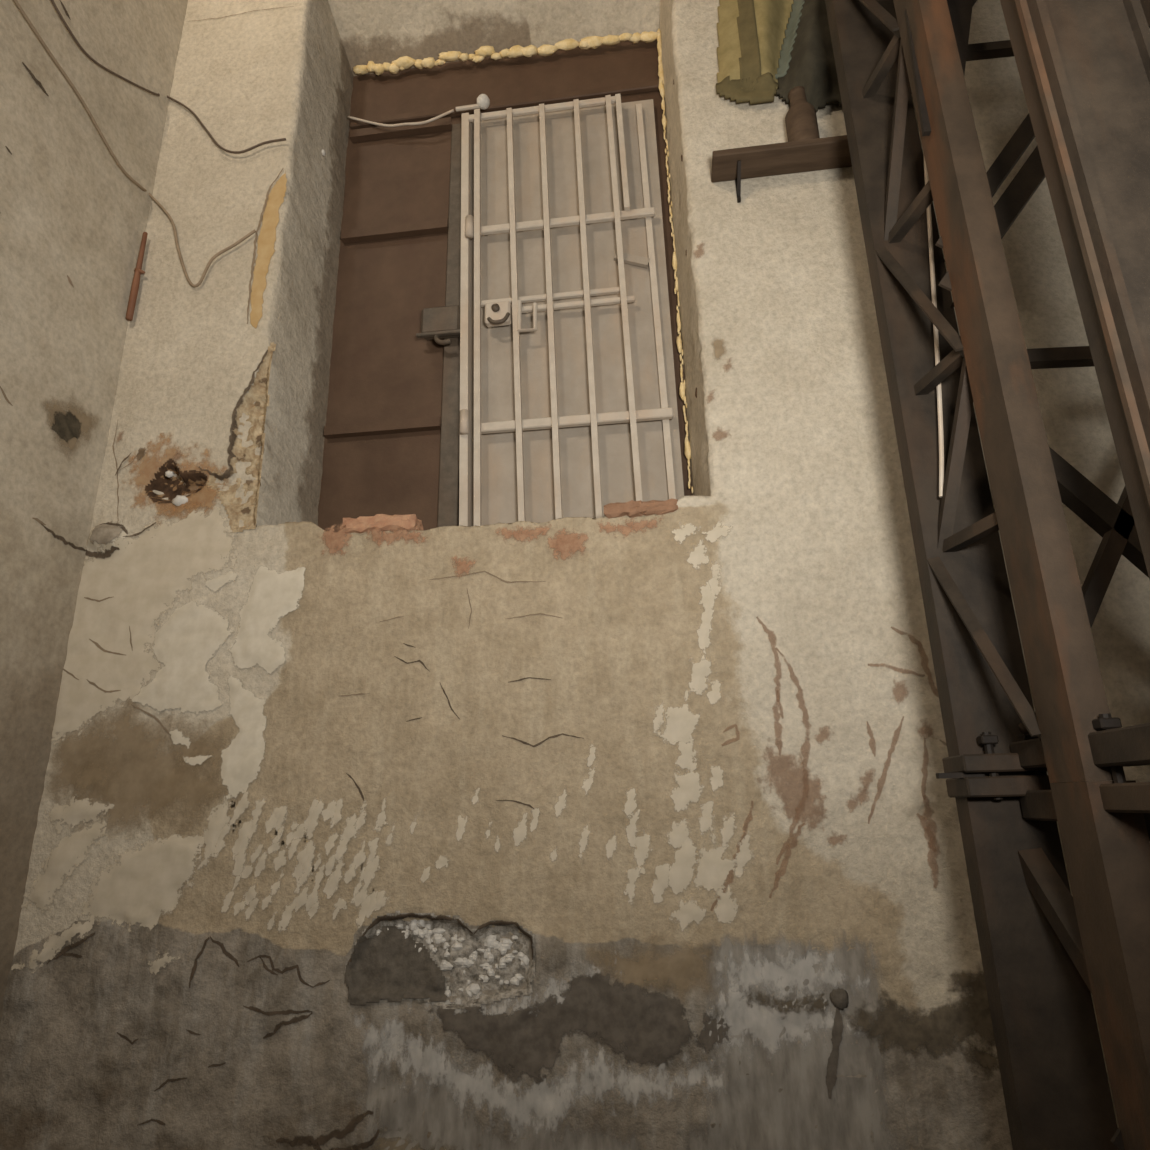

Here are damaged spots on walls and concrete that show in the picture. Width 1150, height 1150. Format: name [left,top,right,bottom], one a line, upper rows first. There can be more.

flaking render [496,527,588,560]
leakage [52,701,225,828]
peeling [11,342,540,1010]
peeling [605,521,755,932]
rust [756,617,829,898]
rust [849,716,904,824]
rust [868,627,939,701]
rust [917,726,947,888]
crack [154,1062,226,1092]
crack [189,936,330,1039]
crack [276,1110,450,1150]
leakage [355,948,999,1138]